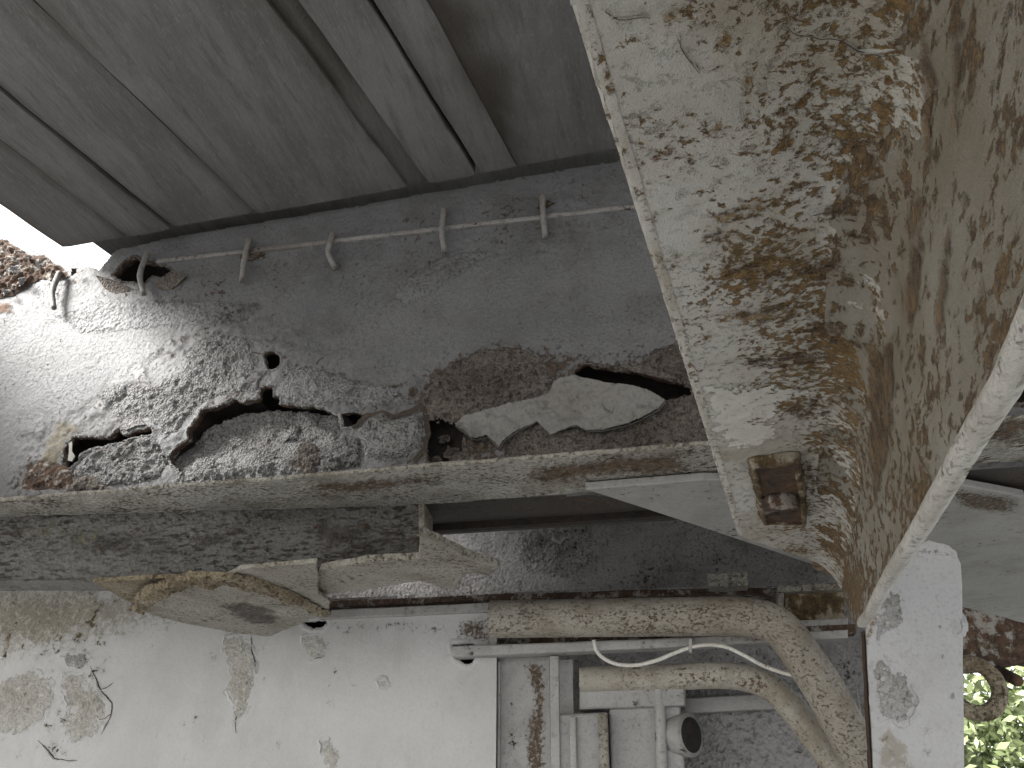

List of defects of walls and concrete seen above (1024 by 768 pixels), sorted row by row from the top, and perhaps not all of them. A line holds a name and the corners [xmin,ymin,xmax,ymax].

spalling [0,239,78,298]
spalling [95,257,171,294]
crack [252,350,266,390]
spalling [264,351,280,370]
peeling [20,364,809,492]
rust [505,341,708,485]
rust [726,315,893,503]
rust [955,490,1019,511]
peeling [0,591,108,748]
rust [524,664,546,768]
peeling [867,589,923,734]
rust [962,607,1024,668]